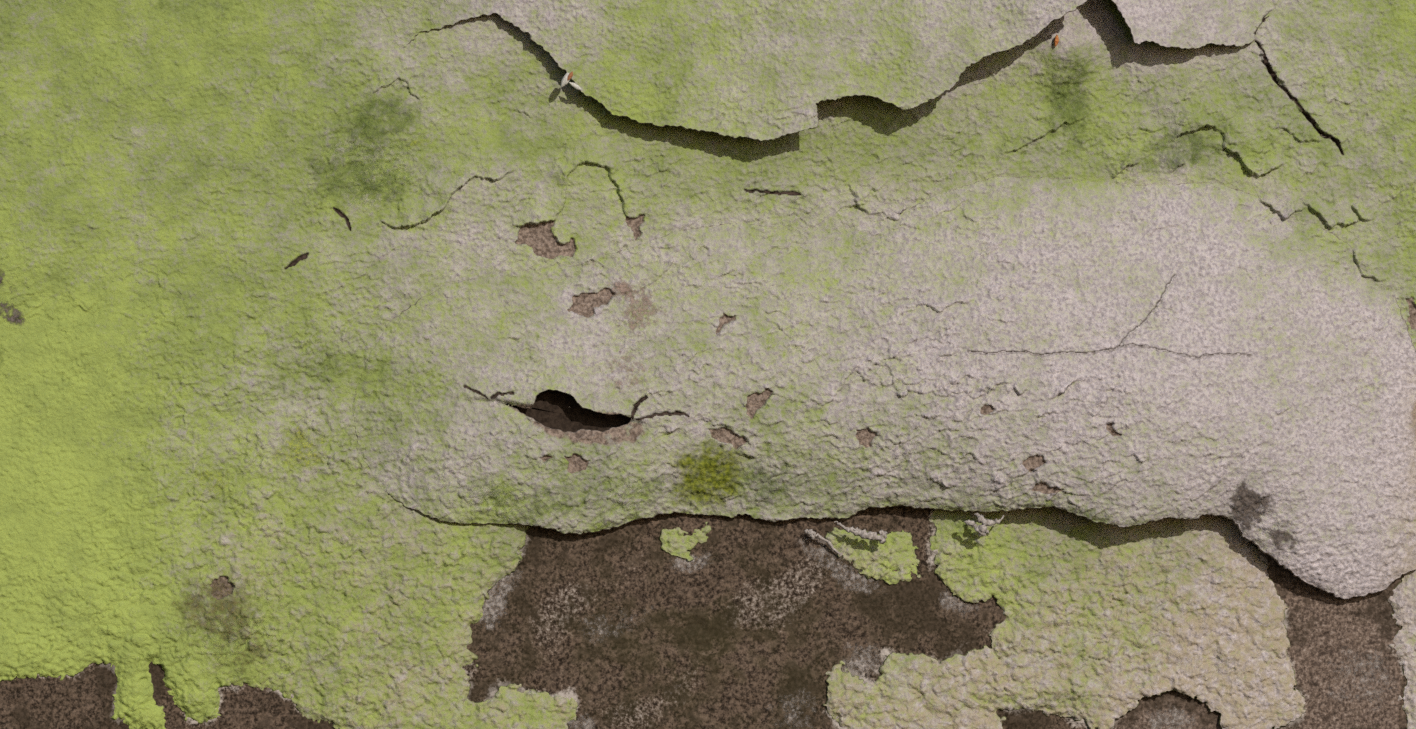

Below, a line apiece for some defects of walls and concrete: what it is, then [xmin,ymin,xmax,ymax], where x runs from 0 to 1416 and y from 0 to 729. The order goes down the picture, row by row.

crack [1255,15,1344,155]
crack [745,188,801,196]
water stain [0,303,24,324]
crack [464,386,514,399]
water stain [1270,530,1296,550]
water stain [480,578,508,628]
spalling [461,508,1004,729]
spalling [1248,541,1408,729]
spalling [996,689,1222,729]